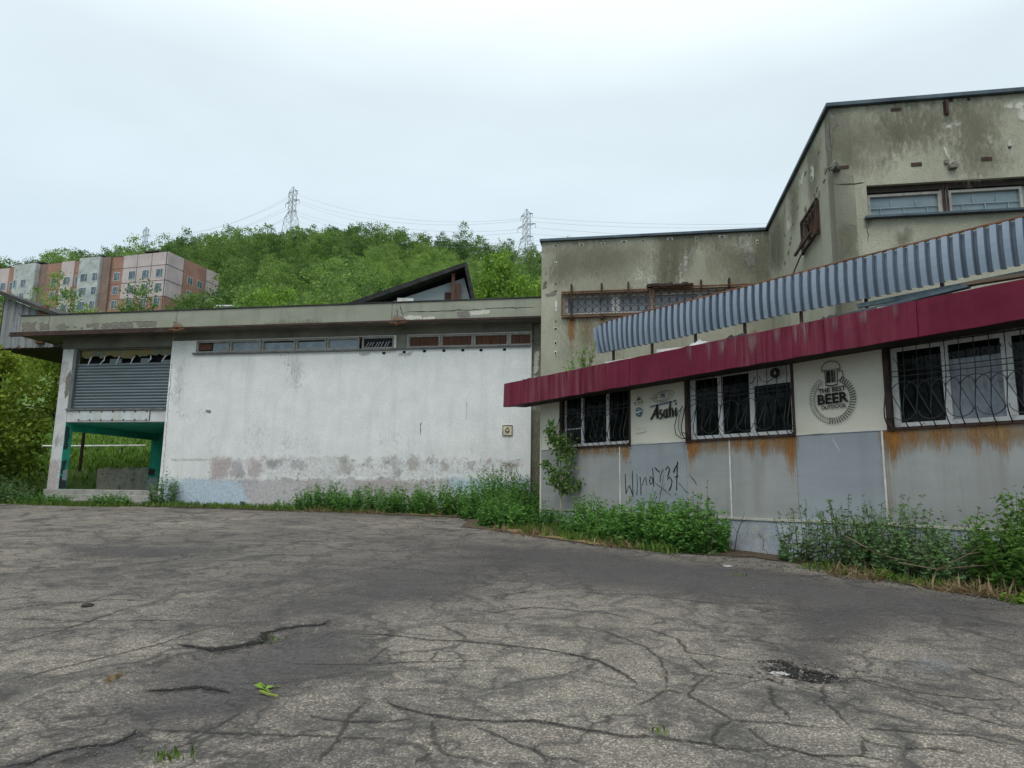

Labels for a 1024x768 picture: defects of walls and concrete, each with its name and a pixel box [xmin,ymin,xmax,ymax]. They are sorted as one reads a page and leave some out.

rust [688,436,796,464]
rust [884,424,1024,452]
peeling [146,455,530,505]
spalling [760,660,841,682]